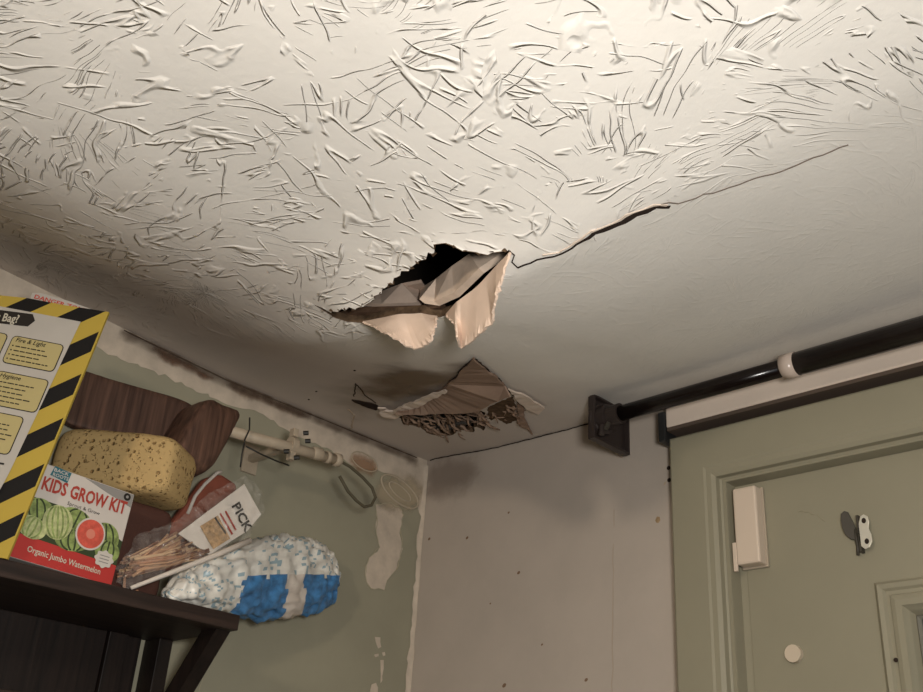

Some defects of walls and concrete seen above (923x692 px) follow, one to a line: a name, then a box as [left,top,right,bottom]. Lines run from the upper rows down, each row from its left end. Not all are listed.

crack [508,144,848,268]
spalling [315,243,511,323]
spalling [400,413,487,436]
peeling [365,502,404,591]